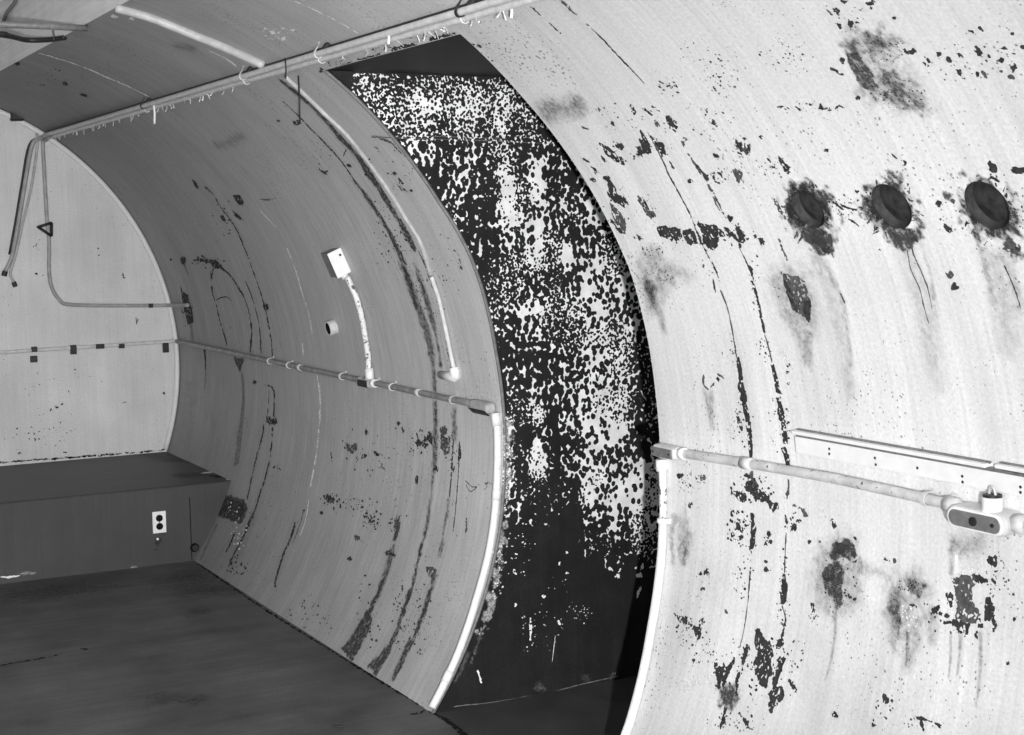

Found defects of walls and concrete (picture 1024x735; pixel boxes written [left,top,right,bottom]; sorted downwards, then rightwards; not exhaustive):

water stain [830,32,925,110]
peeling [761,156,795,178]
rust [774,171,932,324]
rust [935,160,1024,309]
peeling [319,32,763,616]
spalling [218,495,247,524]
peeling [515,603,592,661]
peeling [673,613,714,663]
rust [807,518,859,613]
water stain [888,579,926,656]
rust [924,555,1015,649]